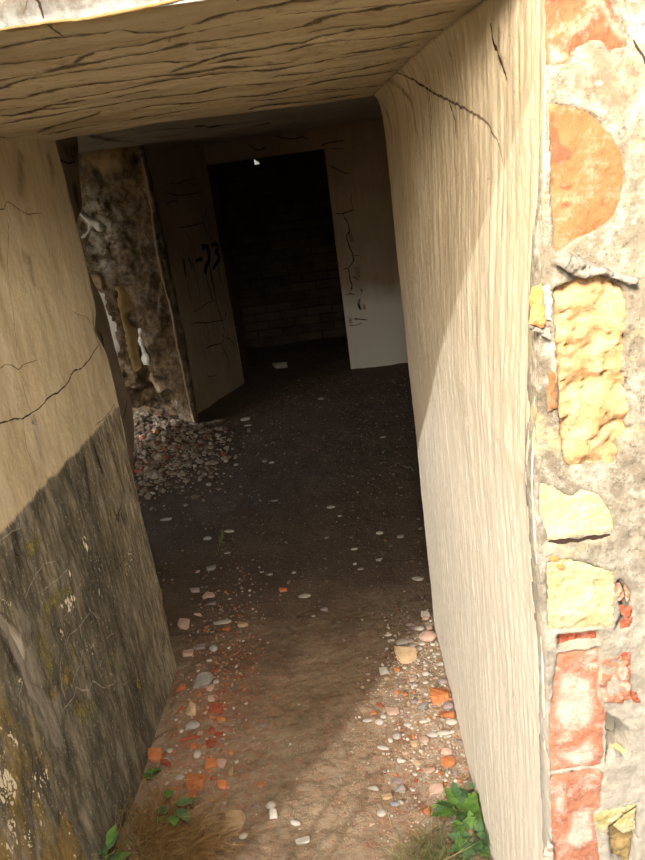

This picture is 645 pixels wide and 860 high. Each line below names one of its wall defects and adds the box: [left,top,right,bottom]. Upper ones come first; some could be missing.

crack [23,0,62,36]
crack [490,23,507,81]
spalling [544,0,627,65]
crack [633,39,645,63]
crack [396,72,503,162]
spalling [545,101,624,251]
crack [0,184,99,485]
spalling [553,275,629,465]
spalling [539,483,613,540]
leakage [0,614,63,752]
crack [60,612,130,734]
spalling [543,556,641,860]